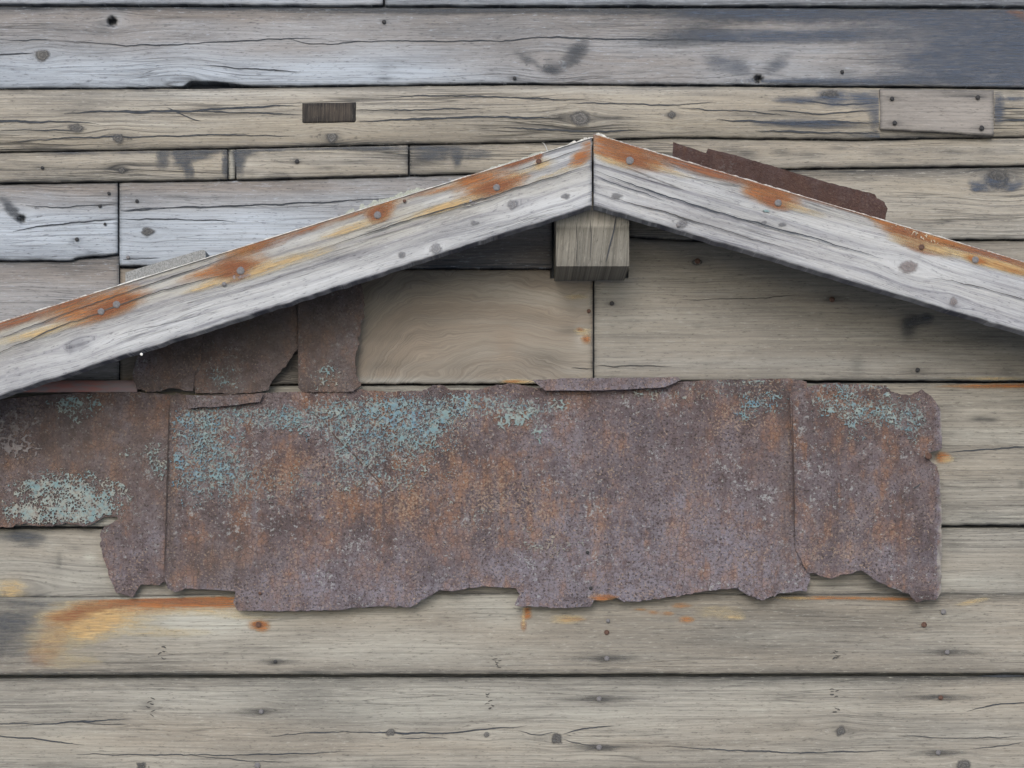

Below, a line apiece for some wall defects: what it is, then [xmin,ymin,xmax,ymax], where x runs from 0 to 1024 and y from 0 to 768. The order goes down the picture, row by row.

corrosion [412,154,548,218]
corrosion [564,136,811,210]
corrosion [187,200,395,291]
corrosion [869,217,1024,275]
corrosion [0,287,141,339]
corrosion [44,597,235,652]